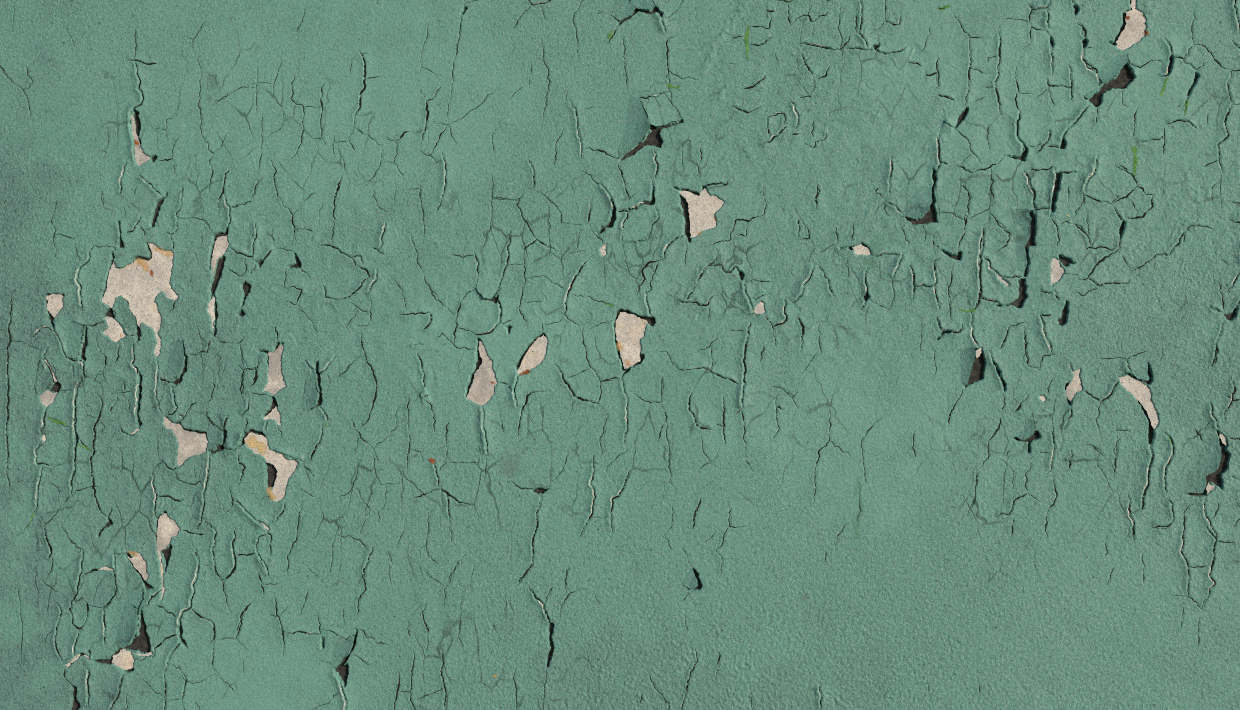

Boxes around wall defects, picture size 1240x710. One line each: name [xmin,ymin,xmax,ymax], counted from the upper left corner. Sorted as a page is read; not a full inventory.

peeling [1083,0,1146,107]
peeling [102,243,187,385]
peeling [164,416,227,466]
peeling [242,343,304,502]
crack [5,0,855,710]
peeling [615,310,655,375]
peeling [675,187,724,242]
crack [814,405,887,563]
crack [732,0,1240,538]
peeling [1098,351,1159,444]
crack [1105,273,1240,643]
peeling [96,512,207,672]